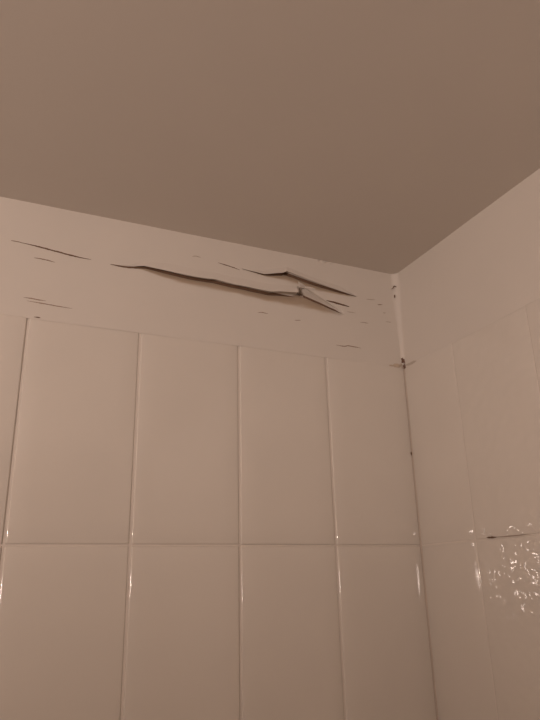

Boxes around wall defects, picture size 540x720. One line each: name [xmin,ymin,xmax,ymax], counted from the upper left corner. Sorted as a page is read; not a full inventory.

crack [11,240,91,262]
peeling [110,262,356,316]